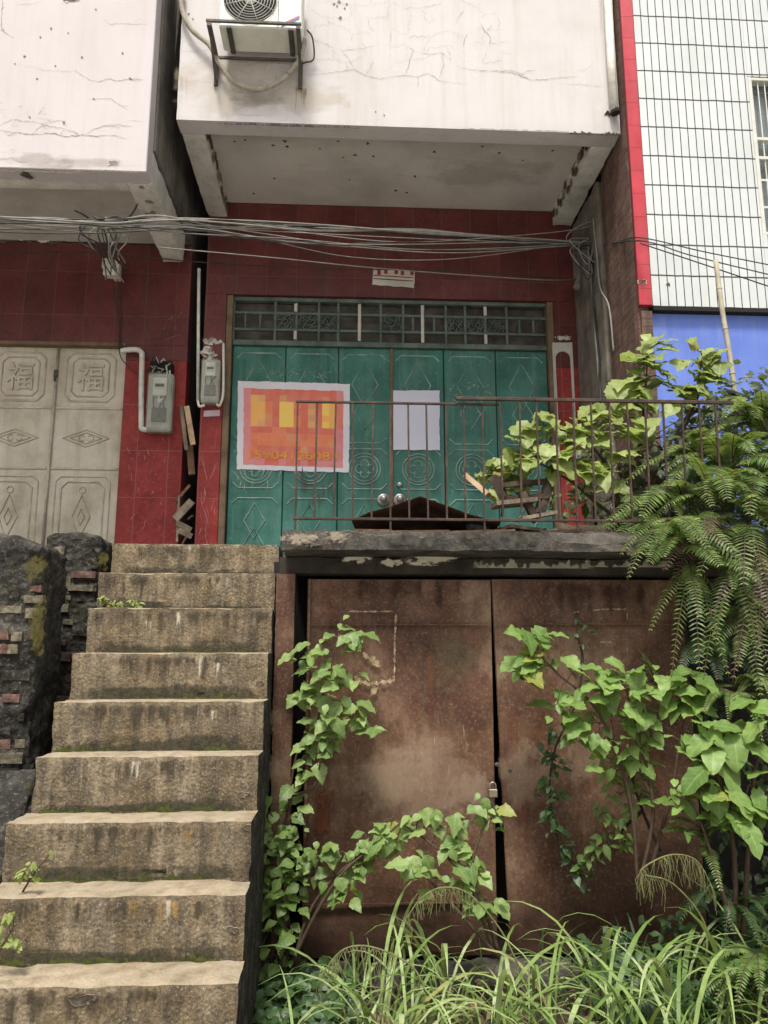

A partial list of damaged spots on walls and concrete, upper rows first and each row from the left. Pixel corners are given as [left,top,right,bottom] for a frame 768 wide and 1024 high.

crack [307,2,603,86]
crack [0,66,143,164]